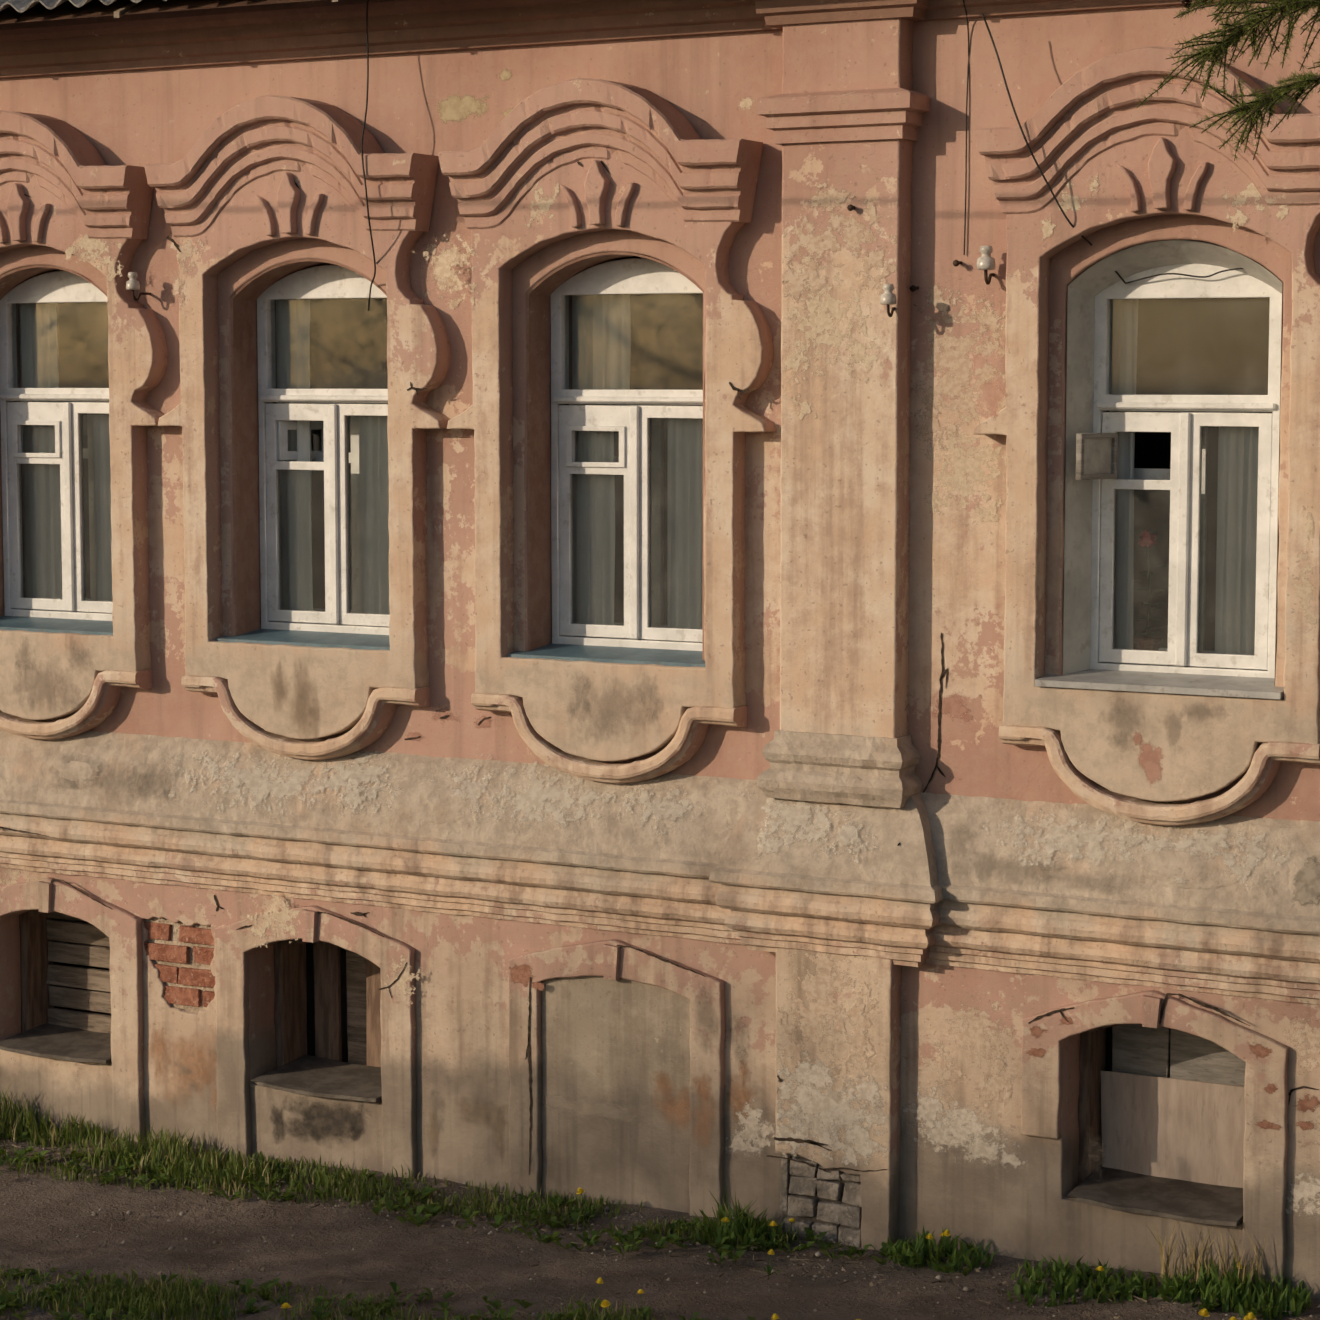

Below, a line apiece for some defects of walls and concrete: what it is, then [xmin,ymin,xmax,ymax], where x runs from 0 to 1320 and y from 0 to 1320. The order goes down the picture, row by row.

peeling [414,234,478,310]
peeling [782,182,897,420]
crack [922,633,948,793]
peeling [1133,733,1162,783]
crack [317,911,384,937]
flaking render [144,917,215,1013]
crack [379,962,407,998]
crack [1028,1007,1074,1024]
crack [1159,993,1250,1026]
leakage [272,1110,284,1139]
leakage [351,1113,363,1137]
flaking render [780,1154,862,1247]